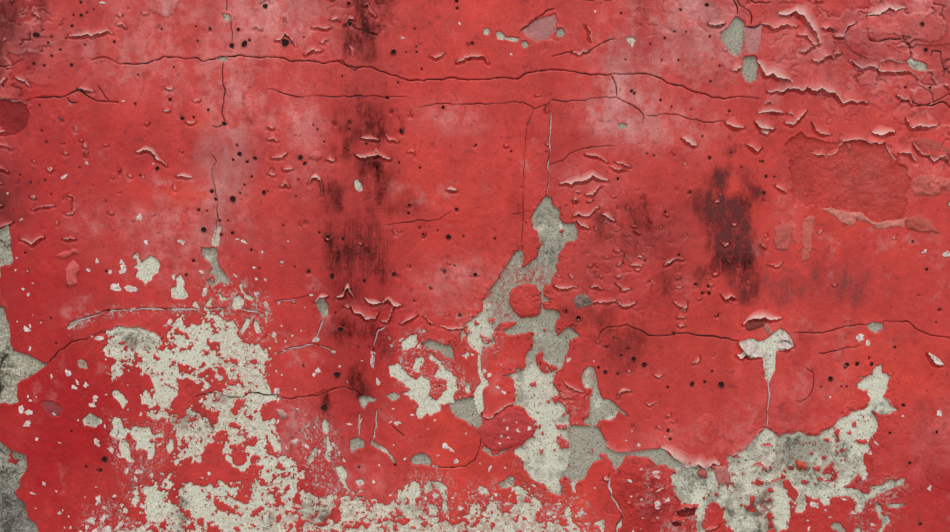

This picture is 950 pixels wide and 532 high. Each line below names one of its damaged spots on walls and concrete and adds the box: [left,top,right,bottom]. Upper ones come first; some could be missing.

damp [345,0,385,60]
crack [38,86,110,103]
peeling [136,145,167,165]
crack [97,8,759,232]
peeling [708,0,950,267]
spalling [0,220,44,277]
peeling [56,235,80,286]
damp [693,169,770,301]
spalling [0,307,47,404]
crack [598,325,740,342]
crack [798,321,950,402]
spalling [0,441,39,532]